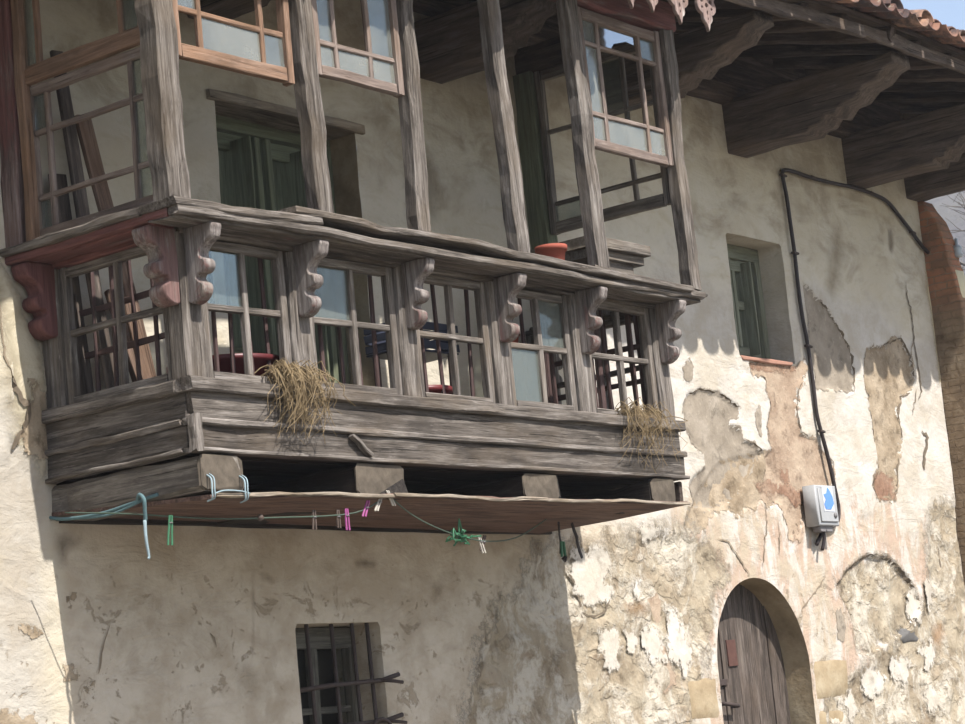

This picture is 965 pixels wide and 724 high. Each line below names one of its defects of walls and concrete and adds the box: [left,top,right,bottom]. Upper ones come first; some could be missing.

crack [0,305,13,376]
flaking render [682,284,915,543]
flaking render [564,541,615,611]
flaking render [597,601,694,678]
flaking render [836,550,936,724]
flaking render [924,684,945,713]